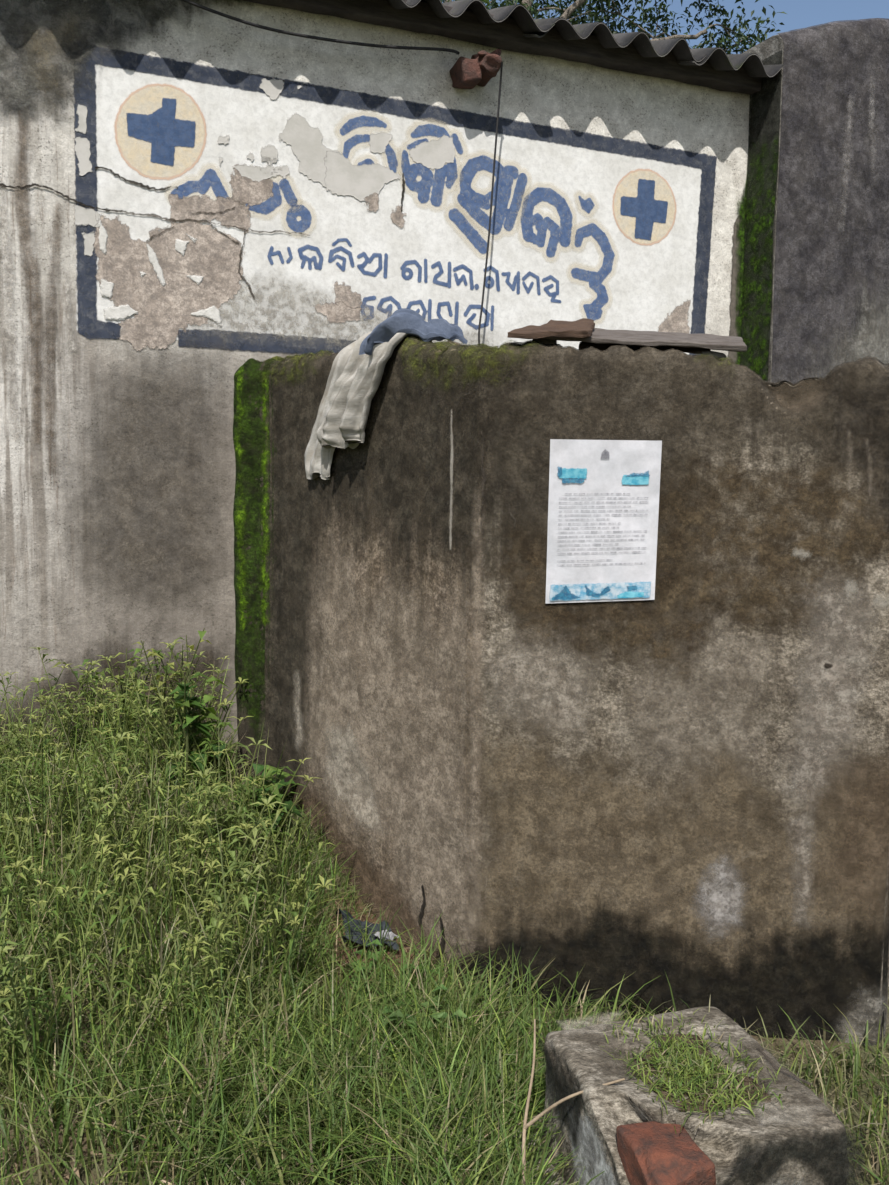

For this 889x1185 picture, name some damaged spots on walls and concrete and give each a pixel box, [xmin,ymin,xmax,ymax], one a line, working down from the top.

water stain [84,369,209,590]
crack [0,166,310,298]
peeling [74,104,406,351]
water stain [261,451,274,624]
water stain [262,355,295,436]
peeling [259,78,302,100]
peeling [409,135,455,170]
peeling [658,301,691,333]
water stain [0,509,255,779]
water stain [791,584,870,794]
water stain [327,727,378,827]
water stain [291,783,889,1185]